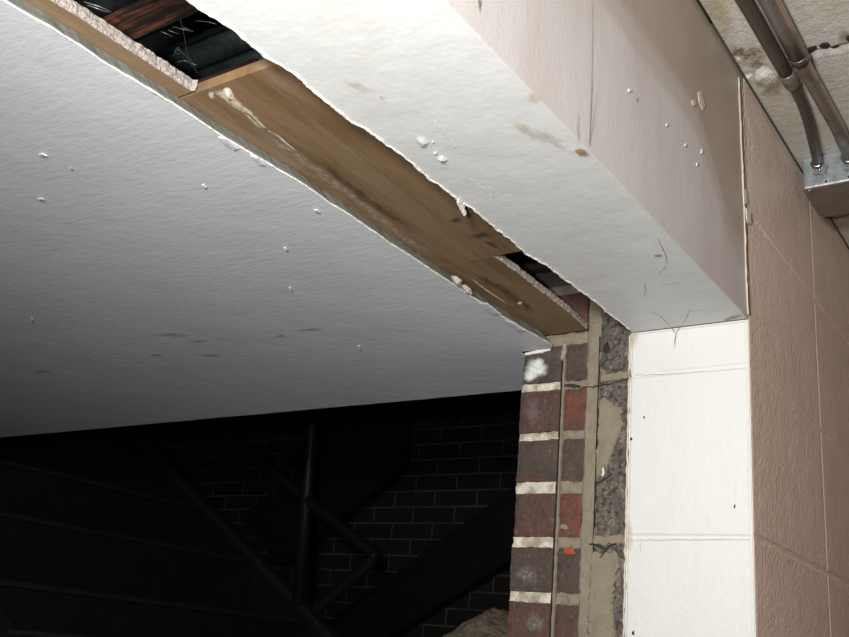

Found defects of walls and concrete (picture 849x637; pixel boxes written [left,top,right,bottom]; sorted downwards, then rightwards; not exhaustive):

spalling [51,0,198,91]
crack [807,35,849,54]
peeling [218,136,240,150]
spalling [494,255,588,329]
peeling [479,302,526,331]
damp [525,359,543,381]